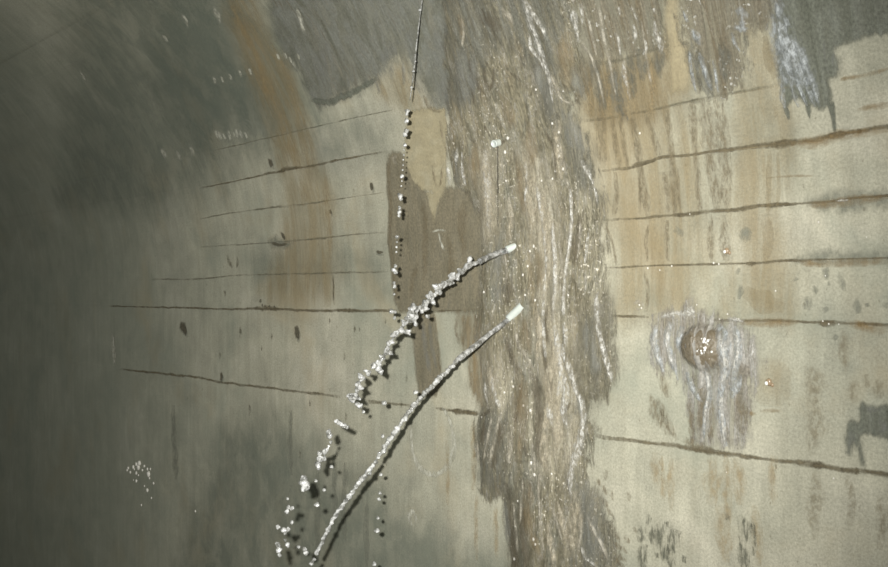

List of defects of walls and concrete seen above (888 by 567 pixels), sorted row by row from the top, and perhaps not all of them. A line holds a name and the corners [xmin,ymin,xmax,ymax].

water stain [570,0,665,119]
water stain [681,0,888,131]
water stain [386,152,485,408]
water stain [845,403,888,463]